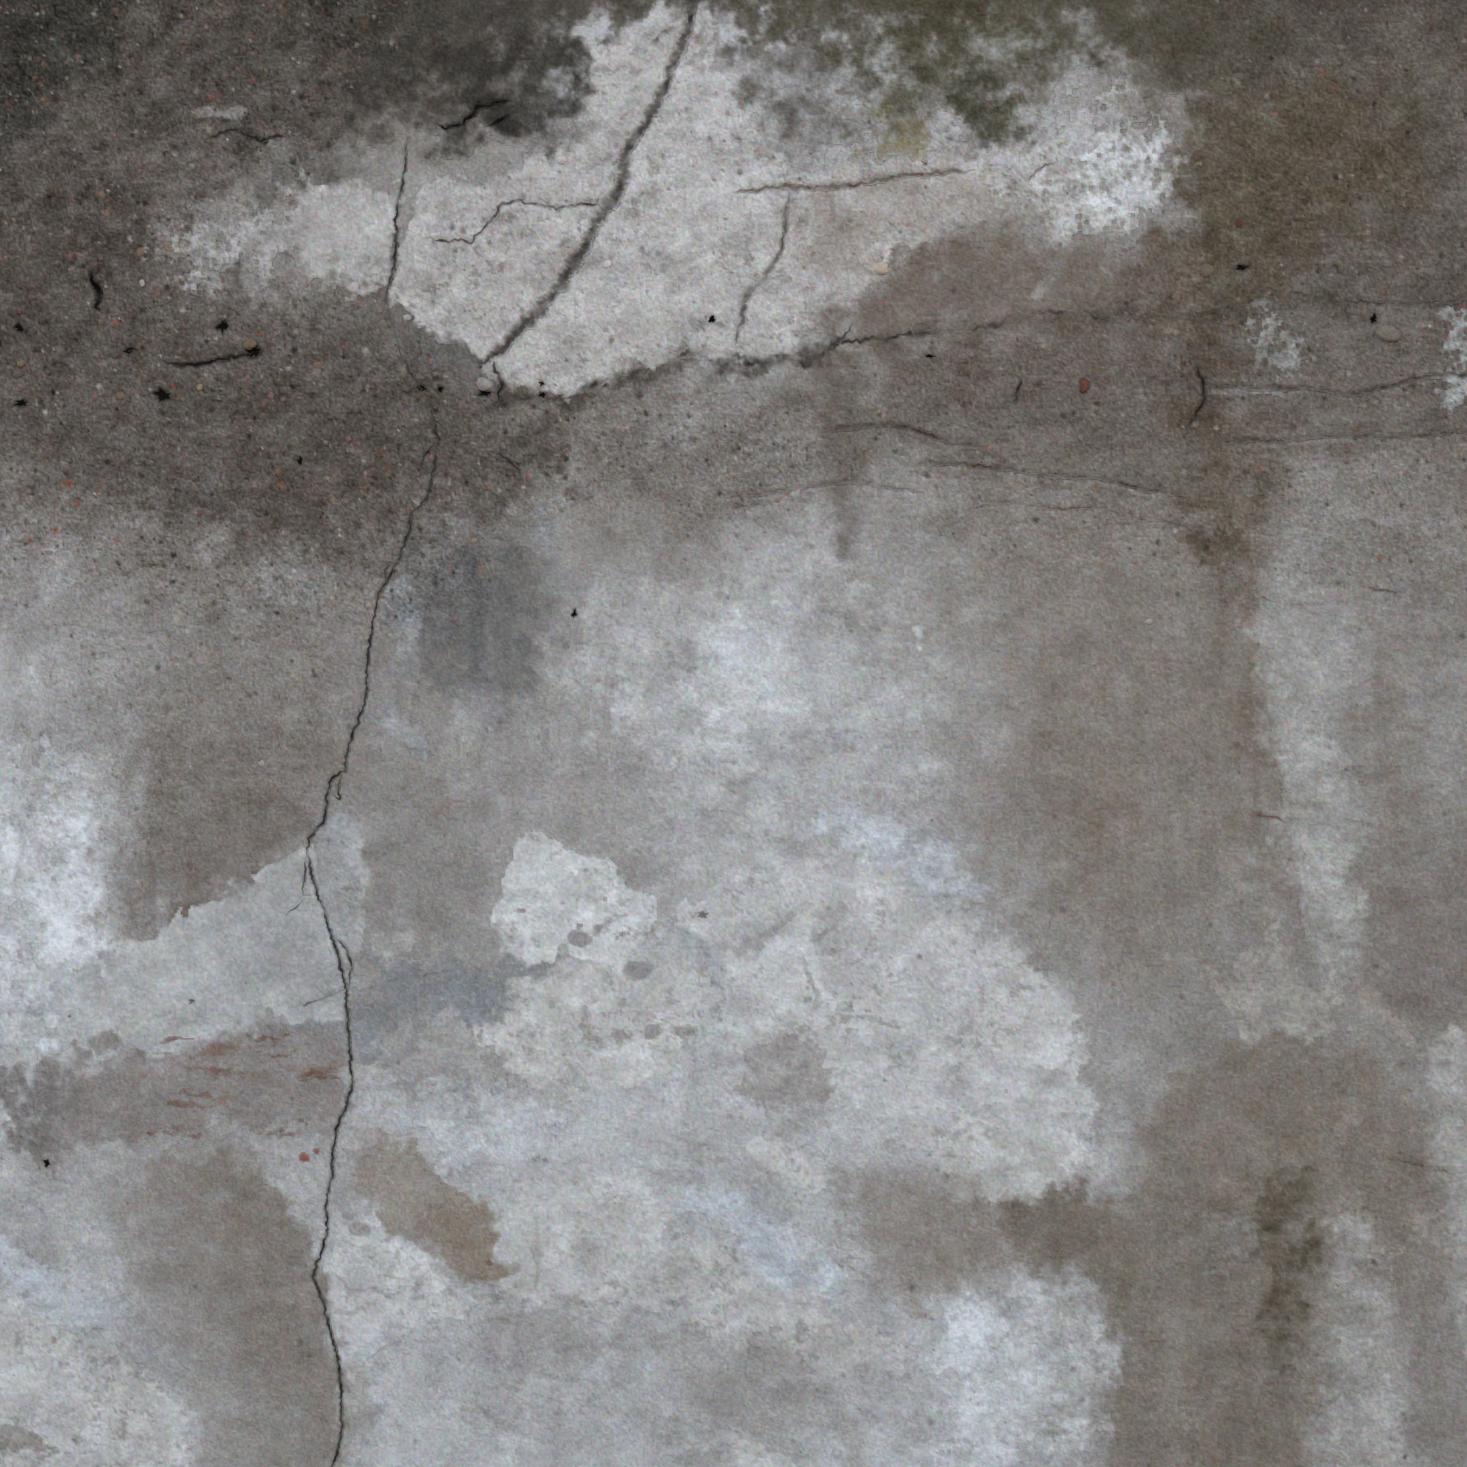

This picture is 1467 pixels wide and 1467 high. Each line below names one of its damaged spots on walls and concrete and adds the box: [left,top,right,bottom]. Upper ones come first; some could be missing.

peeling [189,103,249,123]
spalling [213,318,231,335]
spalling [242,345,264,360]
damp [0,56,817,1146]
crack [425,0,1467,408]
crack [719,421,1204,532]
damp [808,0,1467,428]
crack [1187,360,1467,444]
crack [286,136,490,1467]
peeling [472,830,1116,1202]
damp [675,470,1467,1467]
damp [0,1126,396,1467]